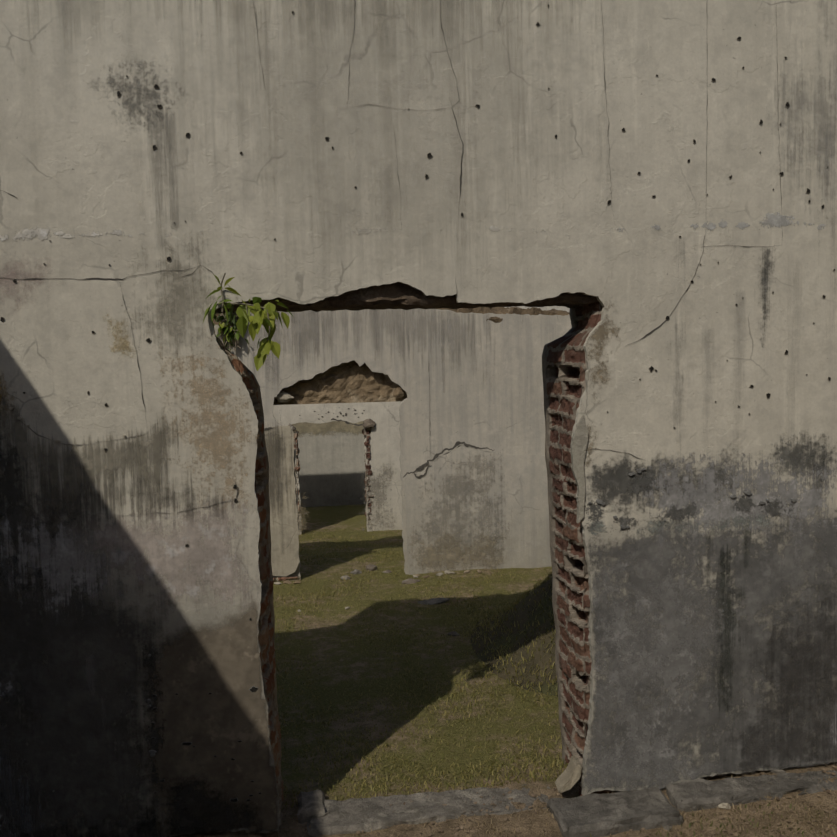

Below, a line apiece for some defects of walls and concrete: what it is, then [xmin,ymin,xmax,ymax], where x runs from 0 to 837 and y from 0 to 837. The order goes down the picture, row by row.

crack [339,0,463,200]
crack [0,265,218,446]
leakage [0,434,278,837]
spalling [216,337,284,835]
spalling [273,360,407,528]
crack [403,441,493,478]
spalling [542,302,612,796]
leakage [588,321,619,382]
peeling [613,515,638,531]
peeling [654,502,697,526]
crack [628,232,783,345]
leakage [585,427,837,792]